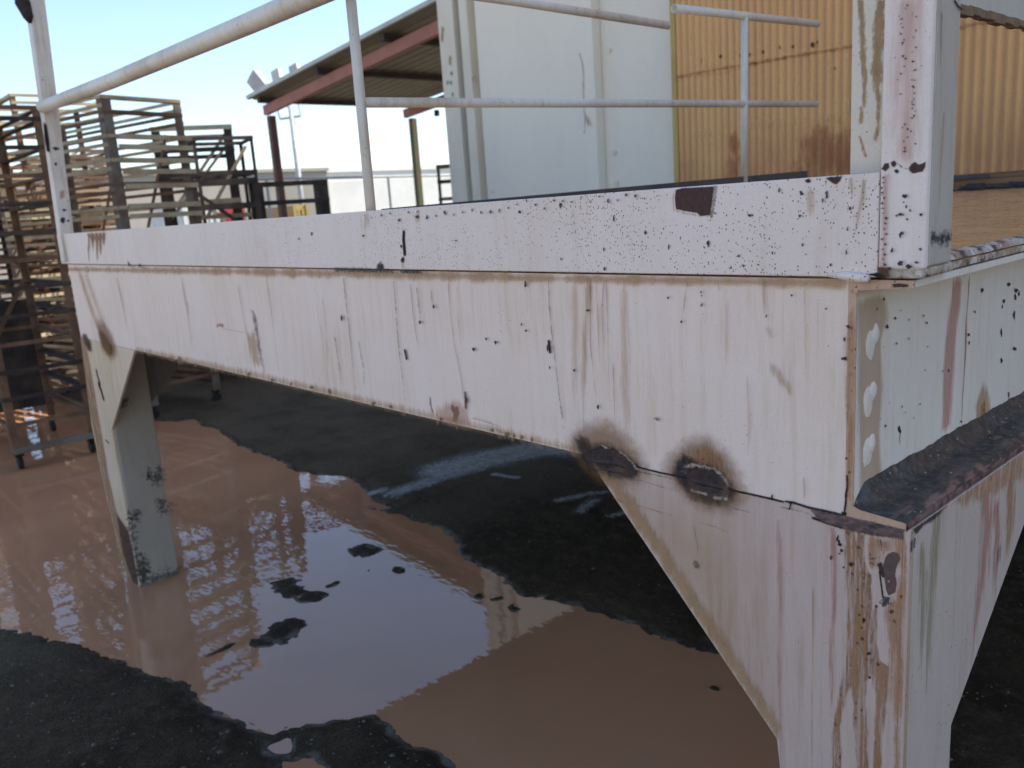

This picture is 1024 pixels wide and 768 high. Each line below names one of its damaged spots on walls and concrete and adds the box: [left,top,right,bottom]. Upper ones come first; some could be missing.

corrosion [858,0,885,137]
corrosion [88,232,105,258]
corrosion [944,278,970,427]
corrosion [977,389,990,418]
corrosion [1007,477,1016,545]
corrosion [811,510,906,768]